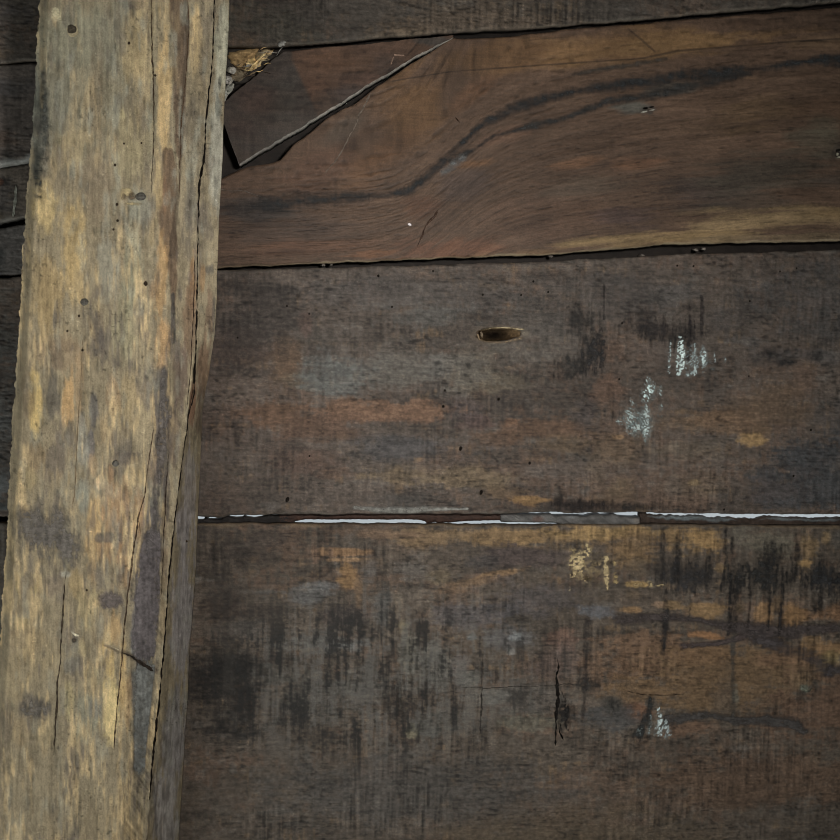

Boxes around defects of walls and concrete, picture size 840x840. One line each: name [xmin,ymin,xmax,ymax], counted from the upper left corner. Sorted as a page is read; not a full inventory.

crack [114,0,215,800]
crack [53,576,66,746]
crack [463,657,578,746]